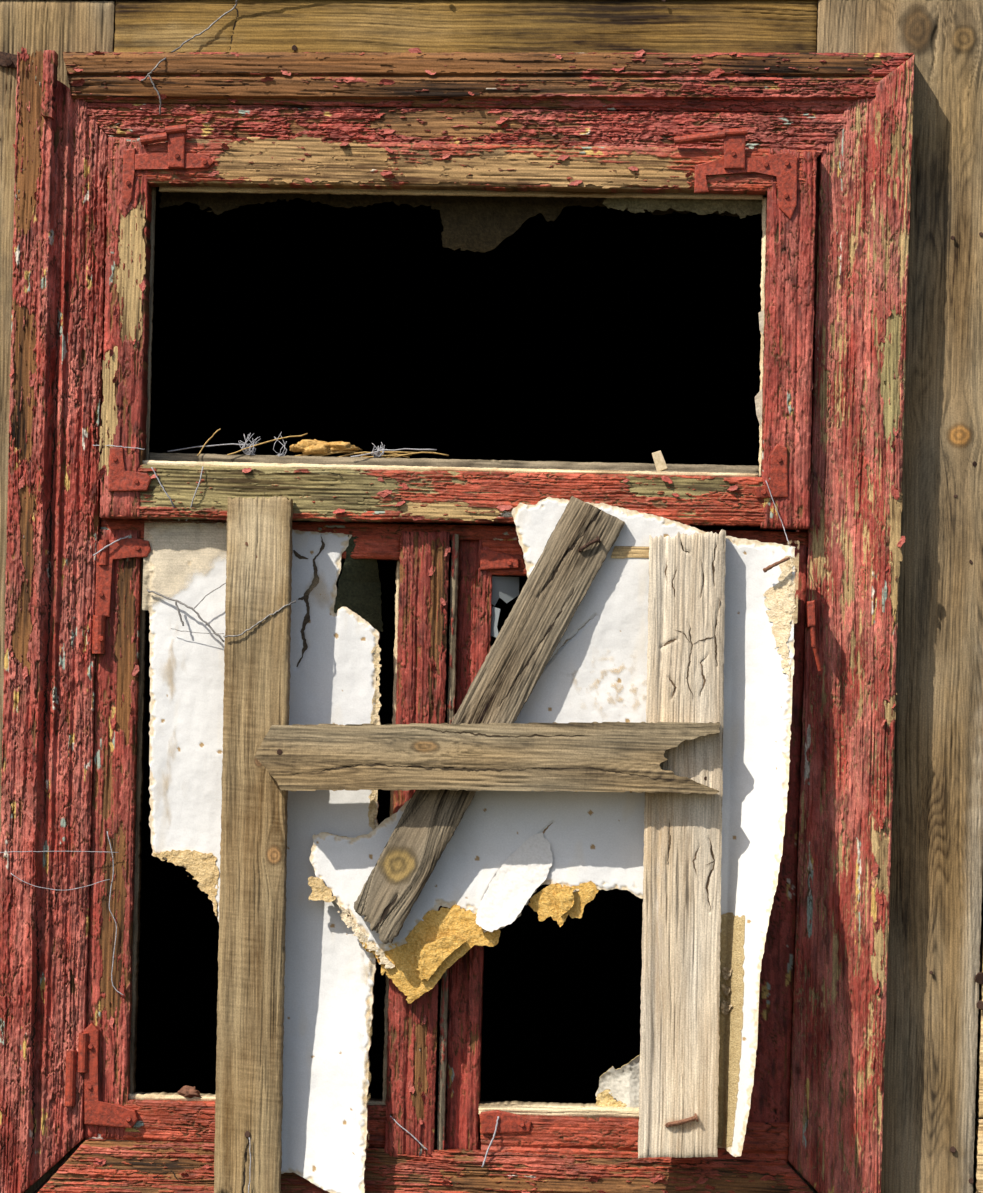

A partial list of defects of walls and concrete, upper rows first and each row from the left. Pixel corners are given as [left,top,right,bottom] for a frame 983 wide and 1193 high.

peeling [72,48,695,188]
peeling [692,52,892,79]
peeling [98,197,148,480]
peeling [9,299,37,680]
crack [293,537,325,667]
peeling [150,468,513,521]
crack [499,510,601,706]
peeling [763,555,796,681]
peeling [884,485,905,616]
crack [292,763,661,779]
crack [413,727,590,737]
peeling [99,826,126,1029]